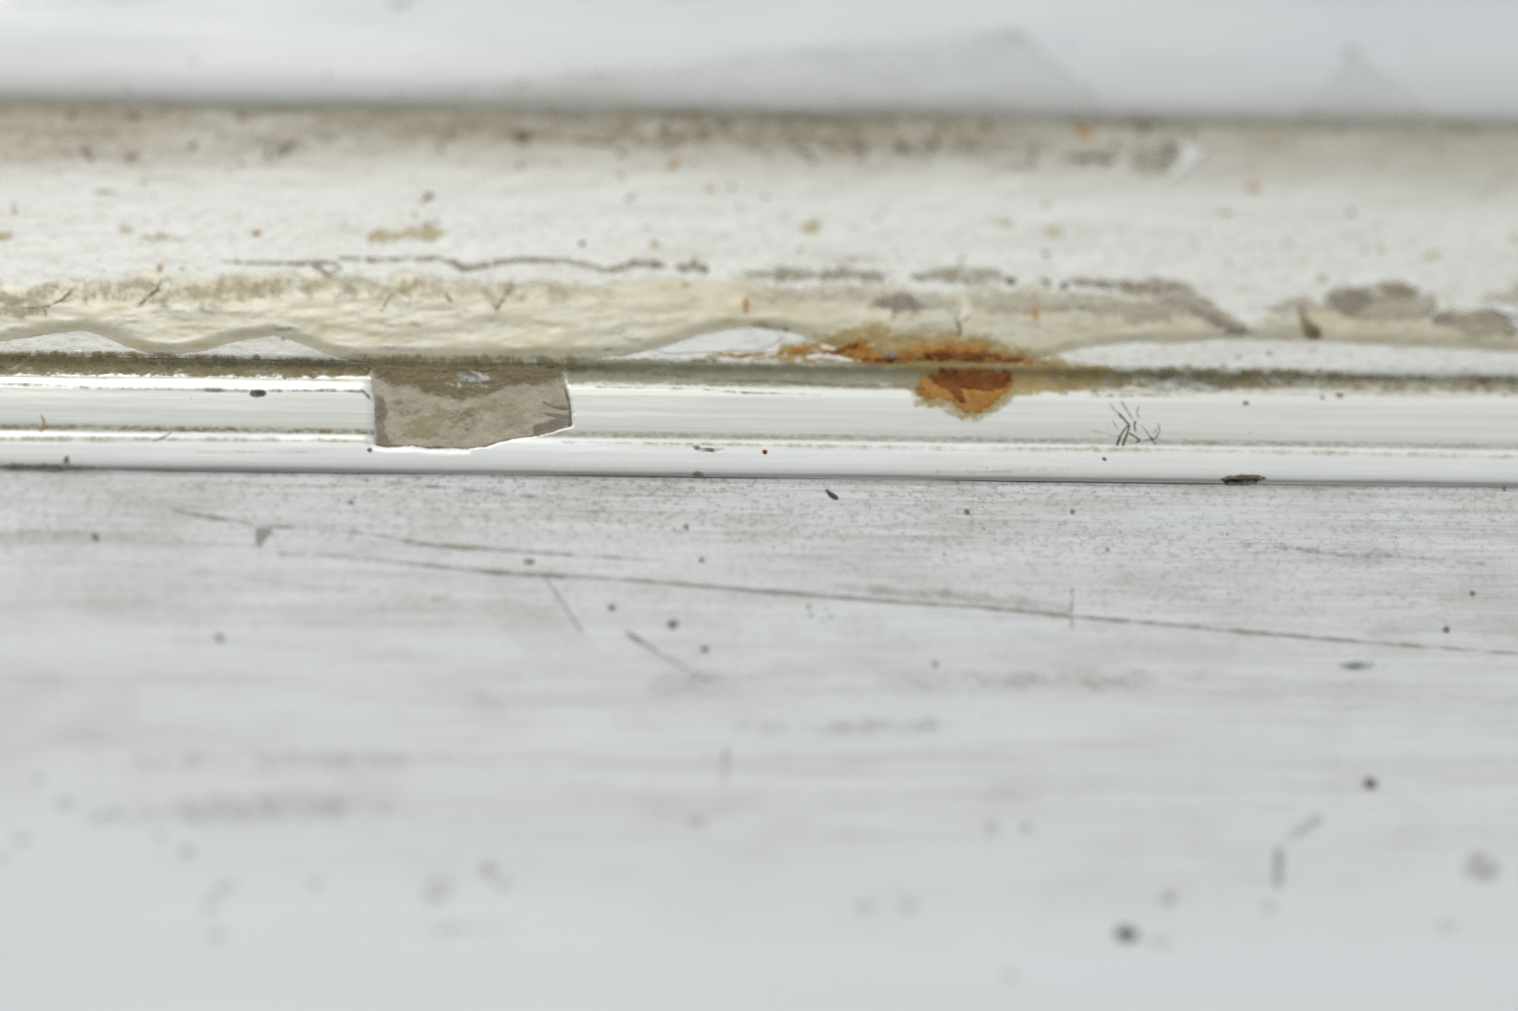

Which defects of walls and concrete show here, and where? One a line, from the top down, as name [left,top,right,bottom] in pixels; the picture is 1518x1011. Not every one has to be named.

peeling [226,255,708,276]
peeling [745,256,1250,334]
peeling [1265,281,1518,337]
spalling [364,354,575,449]
corrosion [705,322,1111,420]